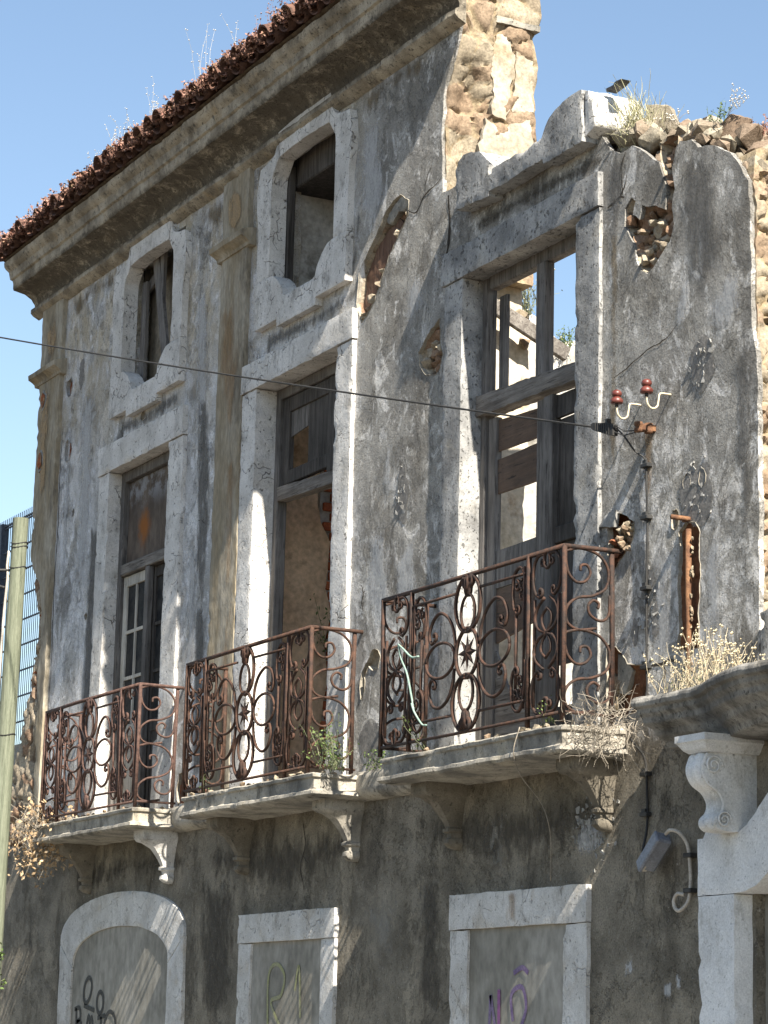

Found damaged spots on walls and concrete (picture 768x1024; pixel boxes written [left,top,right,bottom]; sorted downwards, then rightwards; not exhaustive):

flaking render [356,194,409,323]
flaking render [626,135,683,273]
flaking render [418,318,443,375]
crack [617,323,678,376]
flaking render [599,510,635,569]
water stain [461,803,596,860]
water stain [203,886,233,1010]
water stain [422,887,439,1007]